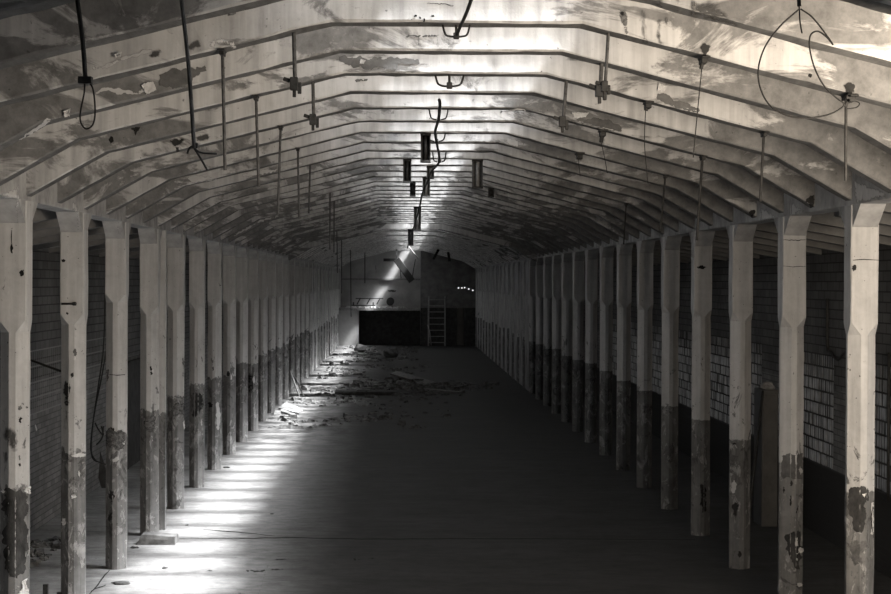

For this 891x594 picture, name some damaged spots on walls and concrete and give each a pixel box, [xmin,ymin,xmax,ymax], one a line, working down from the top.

spalling [106,427,126,462]
peeling [781,453,803,514]
peeling [847,486,874,538]
peeling [1,486,31,594]
peeling [784,531,804,569]